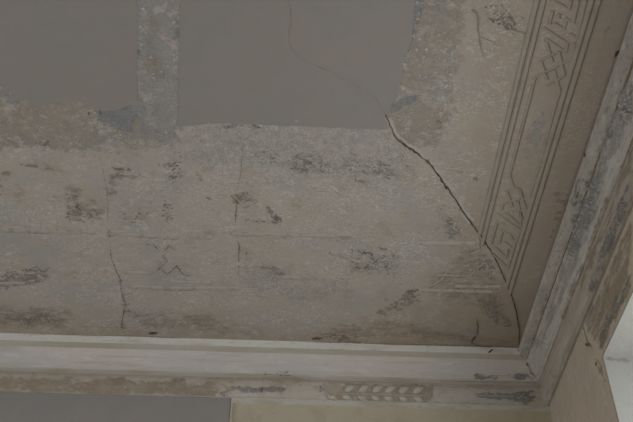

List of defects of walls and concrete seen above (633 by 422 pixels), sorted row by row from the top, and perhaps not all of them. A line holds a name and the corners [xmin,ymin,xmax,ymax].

crack [288,1,540,386]